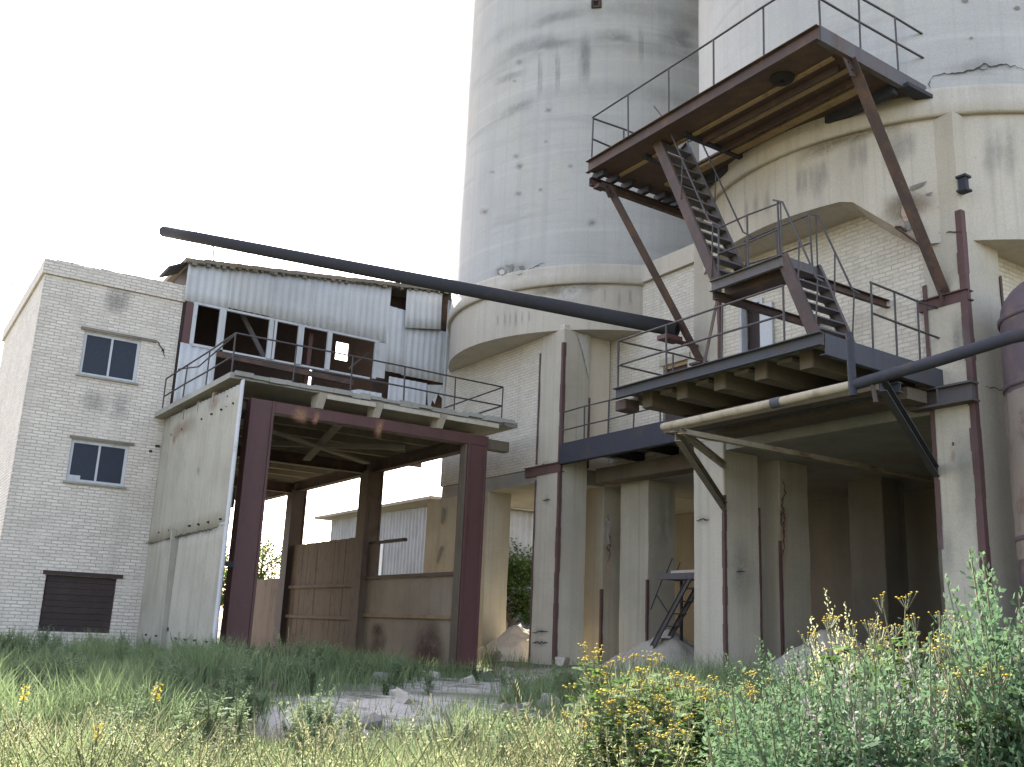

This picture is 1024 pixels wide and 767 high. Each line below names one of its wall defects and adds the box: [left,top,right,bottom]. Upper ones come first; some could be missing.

crack [928,63,1024,87]
spalling [891,181,932,245]
crack [779,480,787,554]